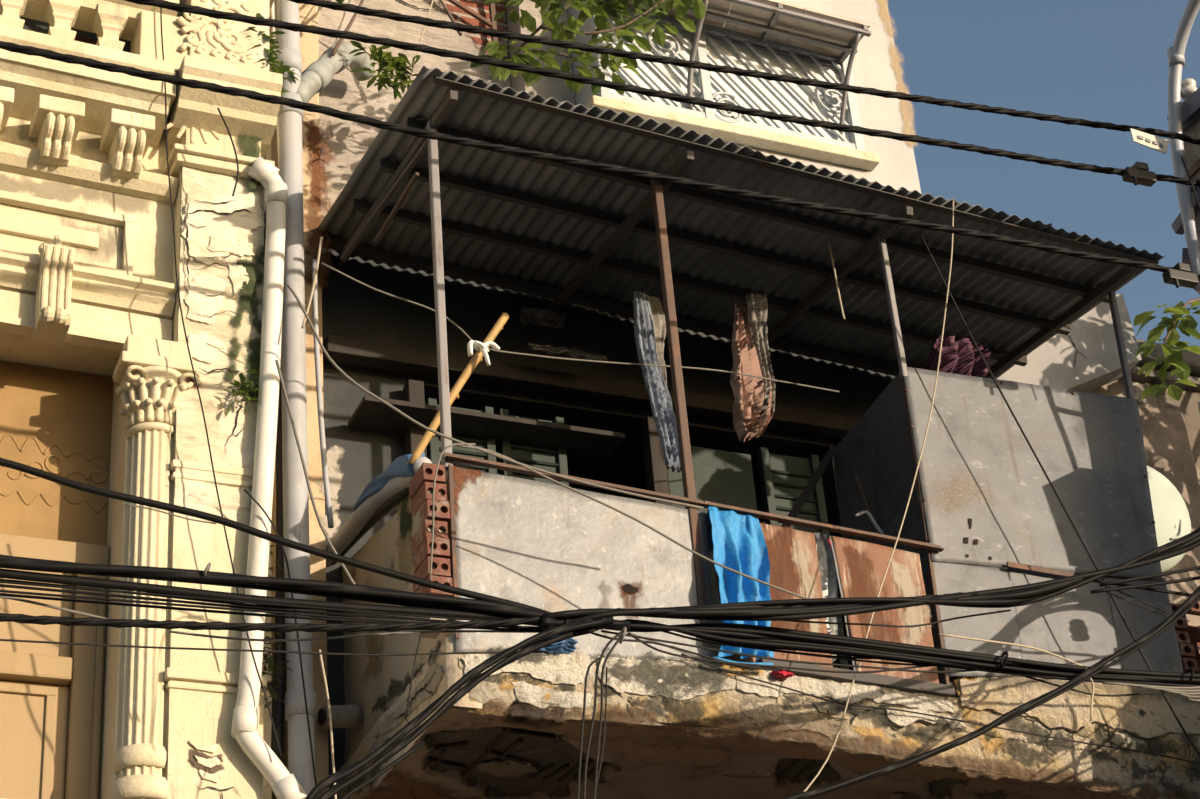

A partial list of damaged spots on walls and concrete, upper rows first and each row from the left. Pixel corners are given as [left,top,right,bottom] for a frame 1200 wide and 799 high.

flaking render [438,0,508,60]
flaking render [181,192,265,364]
corrosion [766,526,816,600]
corrosion [770,619,819,633]
corrosion [844,546,929,645]
spalling [188,740,224,783]
flaking render [365,664,445,766]
flaking render [423,647,1200,799]